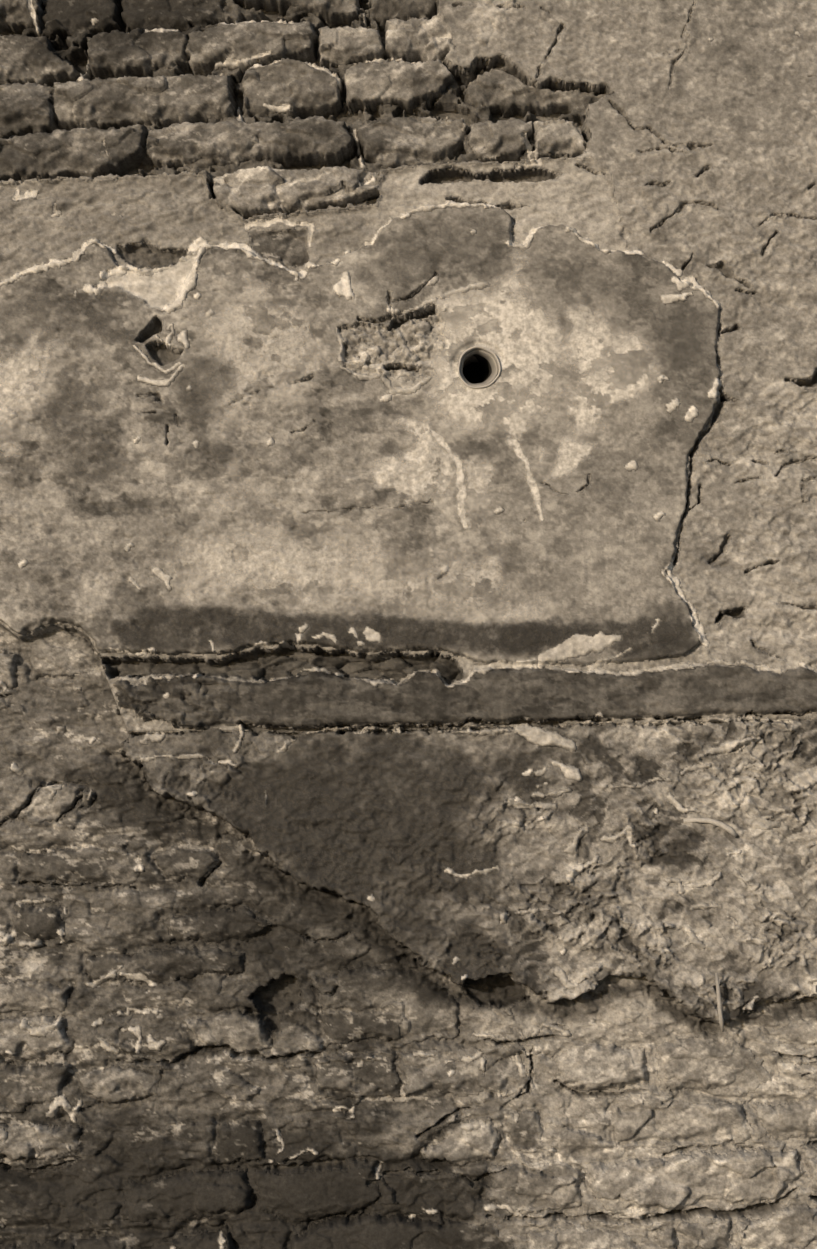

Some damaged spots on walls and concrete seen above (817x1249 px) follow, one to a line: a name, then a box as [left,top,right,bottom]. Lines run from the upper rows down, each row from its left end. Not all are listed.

flaking render [0,0,615,270]
crack [548,151,607,176]
crack [608,100,718,233]
crack [759,184,817,257]
water stain [0,336,48,423]
water stain [206,293,319,414]
spalling [336,277,490,395]
water stain [373,264,652,528]
crack [673,308,817,575]
water stain [112,539,694,659]
crack [777,602,817,611]
flaking render [0,623,817,1249]